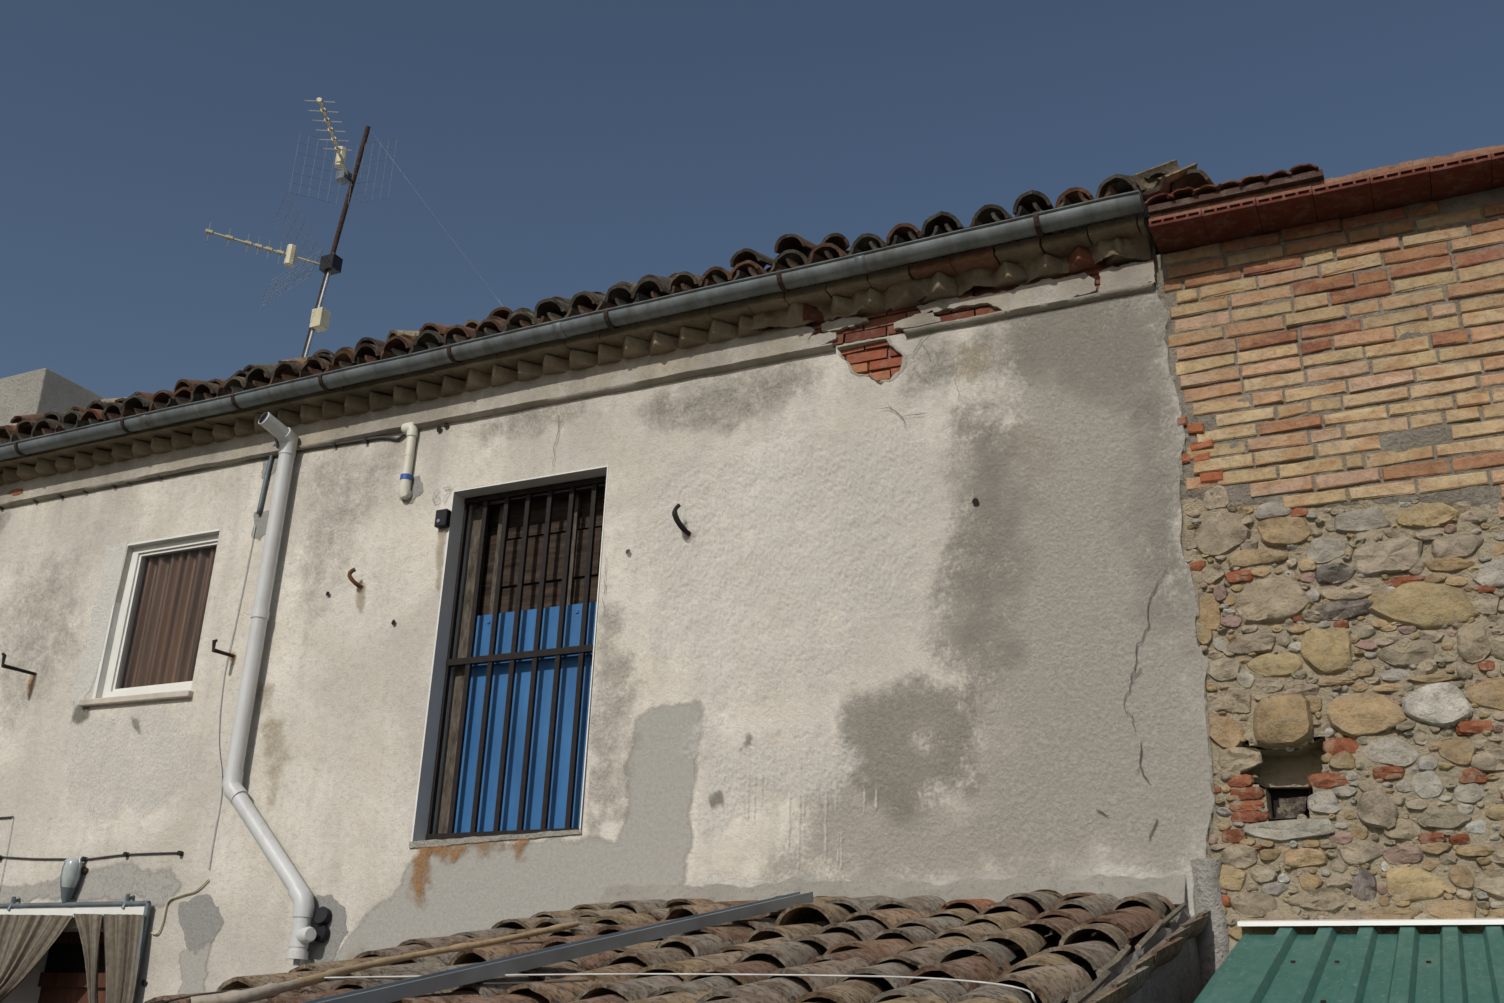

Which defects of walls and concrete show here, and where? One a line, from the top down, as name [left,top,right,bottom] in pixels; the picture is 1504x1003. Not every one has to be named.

peeling [803,246,1157,385]
leakage [696,301,1215,883]
crack [1124,559,1176,785]
corrosion [411,841,489,900]